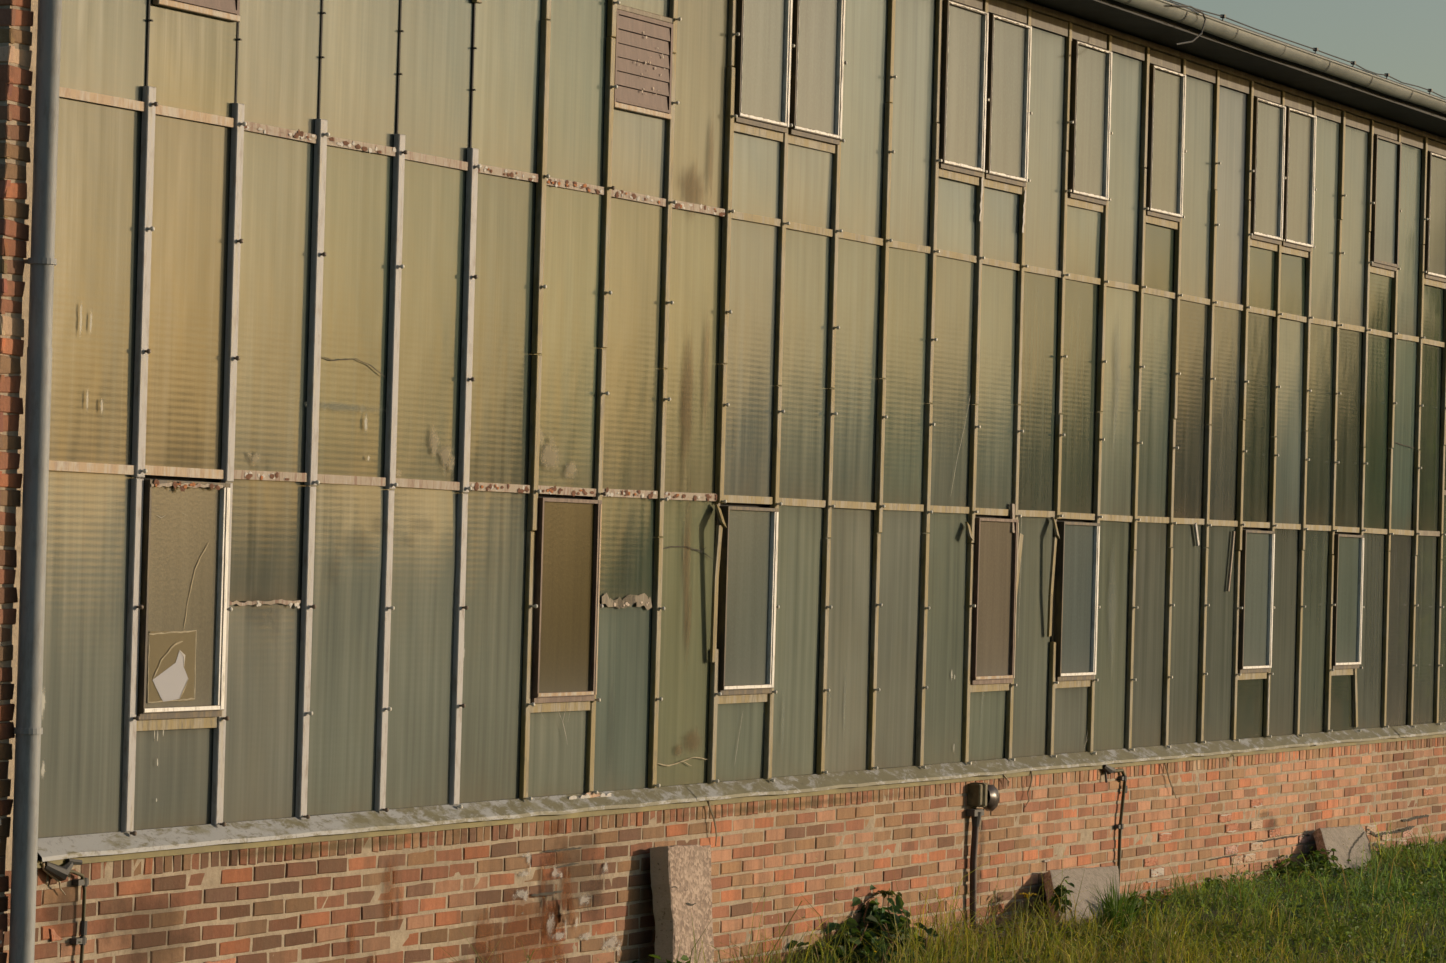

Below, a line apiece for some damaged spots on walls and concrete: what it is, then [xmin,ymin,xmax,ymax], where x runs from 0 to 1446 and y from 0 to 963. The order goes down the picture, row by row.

water stain [517,854,531,900]
water stain [547,896,620,954]